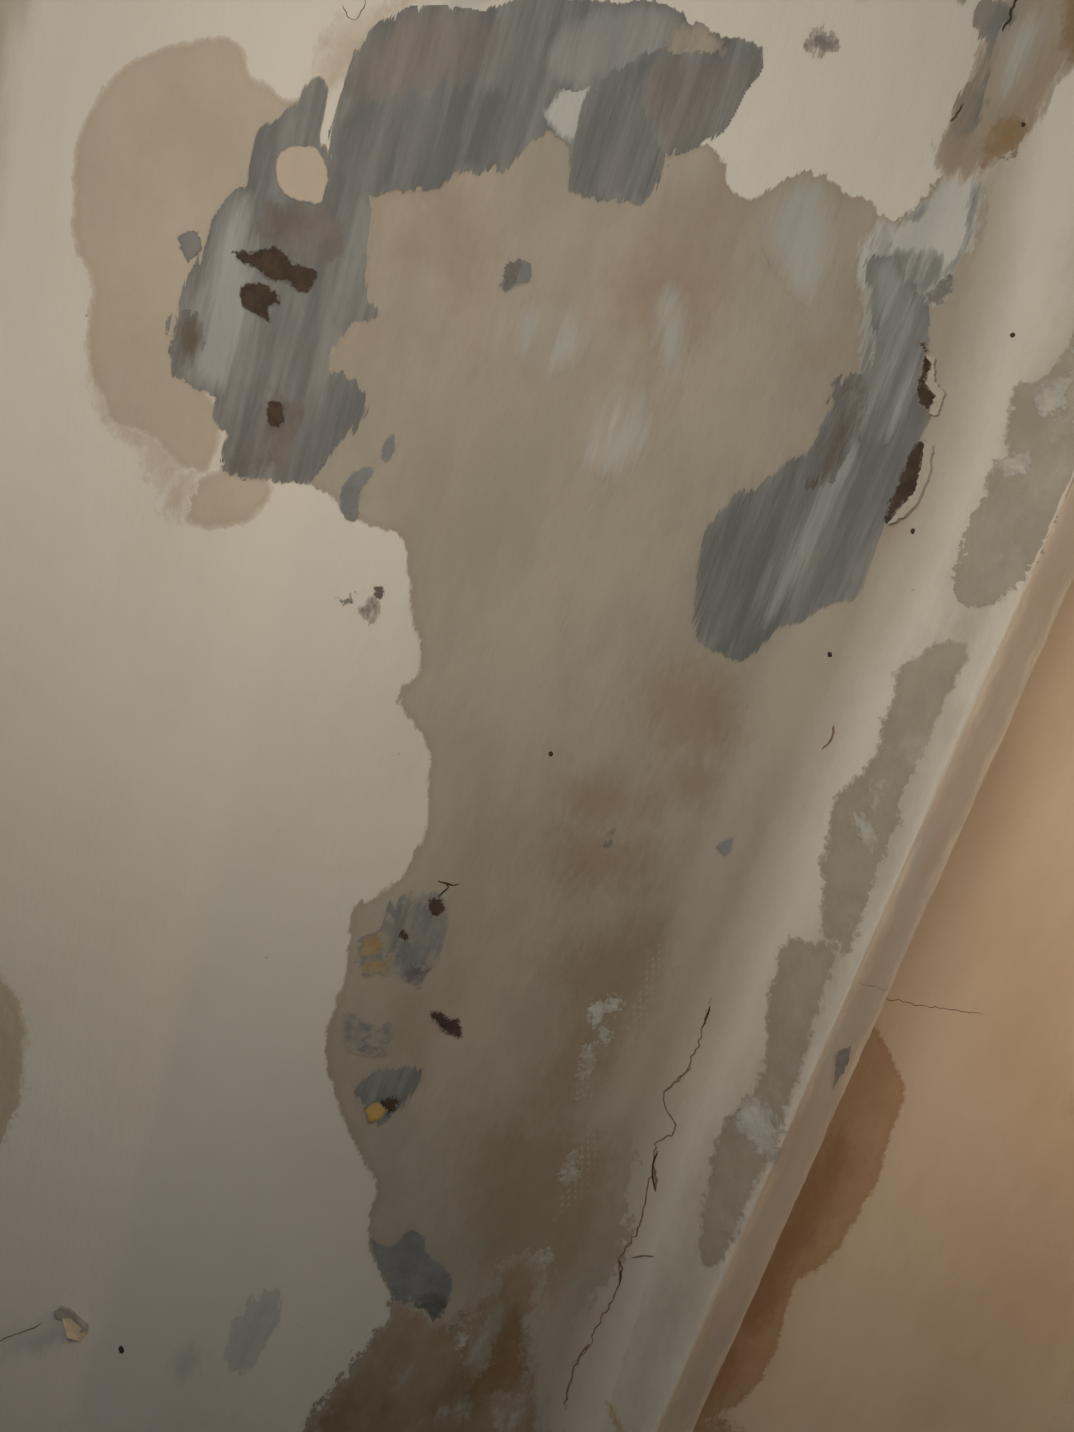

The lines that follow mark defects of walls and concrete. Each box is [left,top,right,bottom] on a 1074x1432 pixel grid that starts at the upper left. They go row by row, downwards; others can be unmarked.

water stain [69,35,299,531]
peeling [339,434,396,522]
peeling [165,0,764,486]
peeling [692,253,947,663]
water stain [302,0,1074,1432]
peeling [354,880,458,989]
crack [563,997,712,1410]
spalling [833,1046,851,1086]